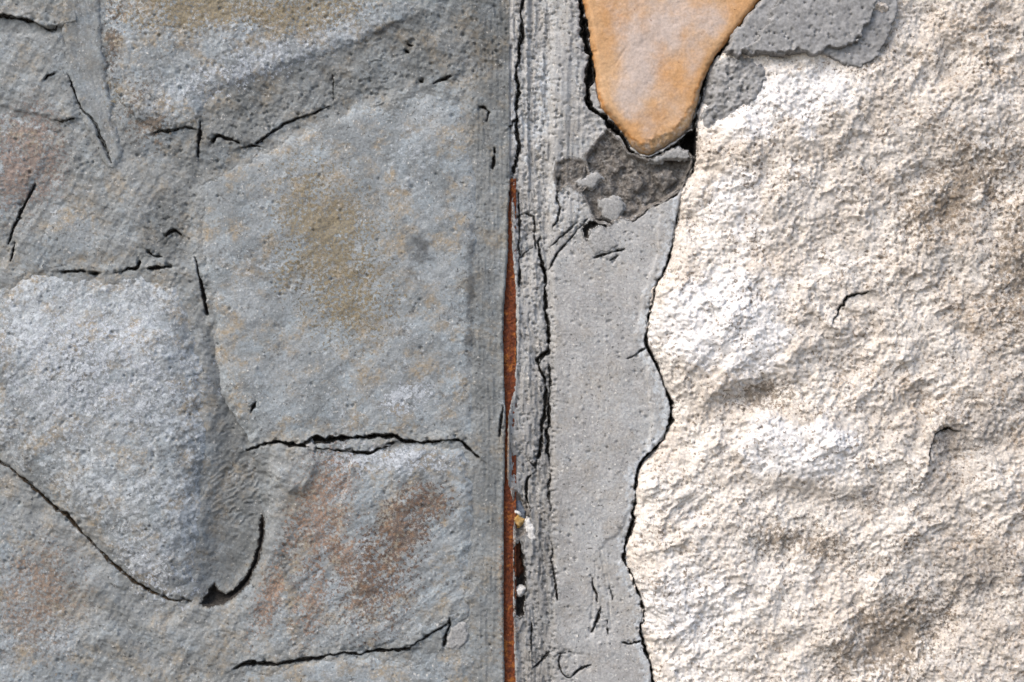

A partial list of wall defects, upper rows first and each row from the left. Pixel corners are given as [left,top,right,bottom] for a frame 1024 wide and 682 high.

peeling [722,0,898,68]
crack [154,80,334,157]
crack [8,184,36,261]
crack [195,258,208,314]
crack [480,0,588,511]
spalling [552,129,694,254]
crack [579,0,727,682]
crack [832,291,869,324]
crack [249,433,479,457]
crack [0,460,191,602]
corrosion [498,418,519,679]
crack [234,620,451,669]